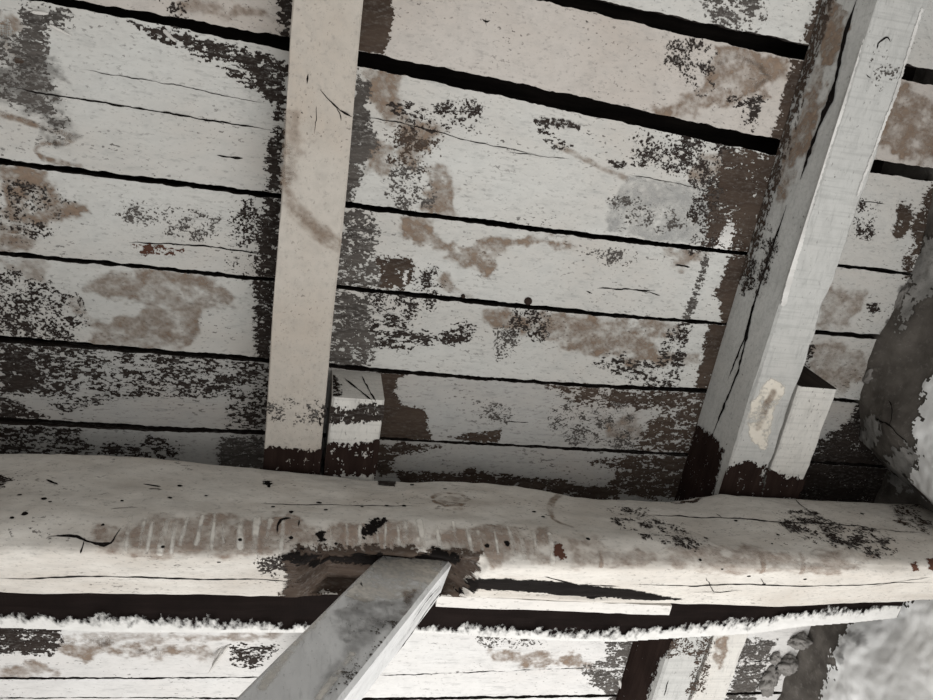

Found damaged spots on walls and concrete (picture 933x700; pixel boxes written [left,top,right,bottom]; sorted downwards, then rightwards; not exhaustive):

water stain [655,46,789,116]
water stain [2,114,39,127]
water stain [0,130,88,252]
water stain [401,165,570,277]
peeling [0,0,900,559]
water stain [91,297,201,345]
water stain [540,313,679,369]
crack [713,208,786,433]
crack [49,507,138,553]
water stain [108,513,313,559]
water stain [328,519,424,552]
water stain [436,521,556,568]